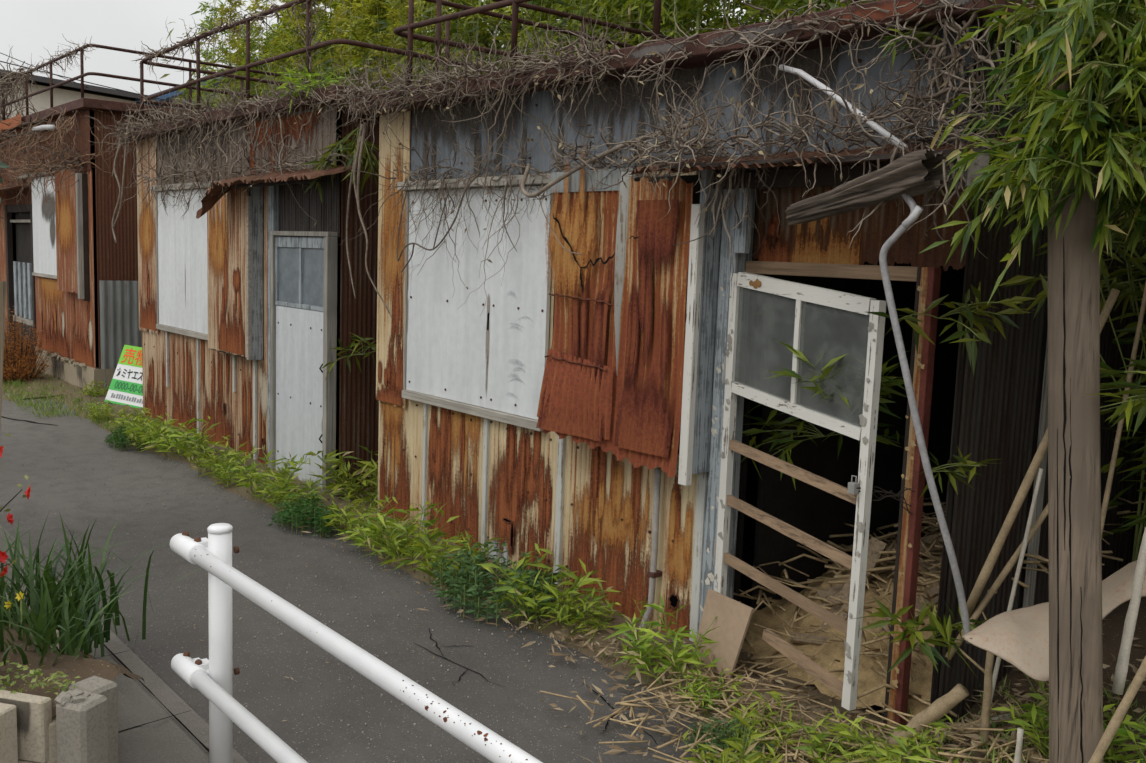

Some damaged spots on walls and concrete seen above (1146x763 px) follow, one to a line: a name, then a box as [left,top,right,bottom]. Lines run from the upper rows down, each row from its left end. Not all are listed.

corrosion [56,188,75,257]
corrosion [38,278,94,366]
corrosion [139,169,157,331]
corrosion [143,194,268,466]
corrosion [375,146,411,523]
corrosion [428,199,693,639]
corrosion [546,154,613,391]
corrosion [758,208,862,265]